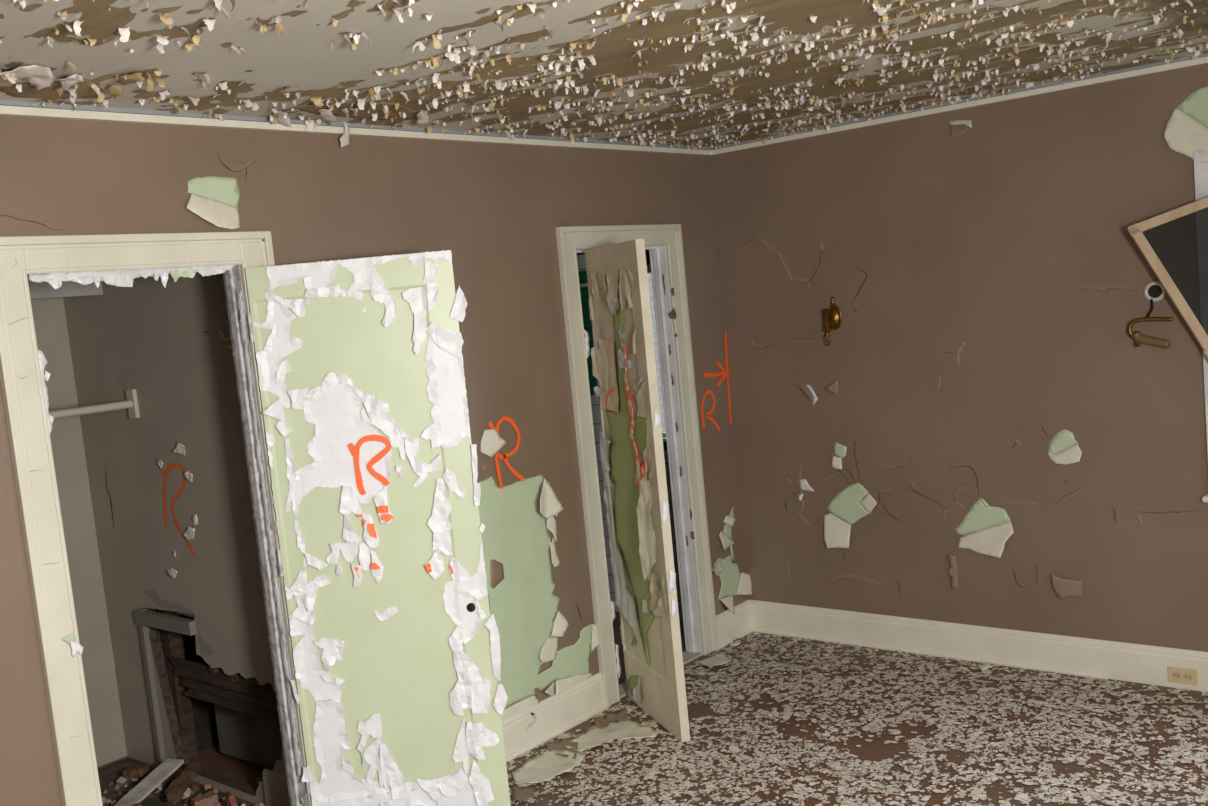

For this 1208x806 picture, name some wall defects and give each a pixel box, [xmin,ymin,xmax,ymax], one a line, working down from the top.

peeling [0,0,1208,150]
peeling [1164,86,1208,163]
crack [0,213,65,231]
peeling [186,176,240,229]
peeling [155,250,599,806]
peeling [584,267,678,704]
peeling [712,507,752,615]
peeling [824,483,877,548]
peeling [947,498,1014,589]
peeling [1047,429,1082,465]